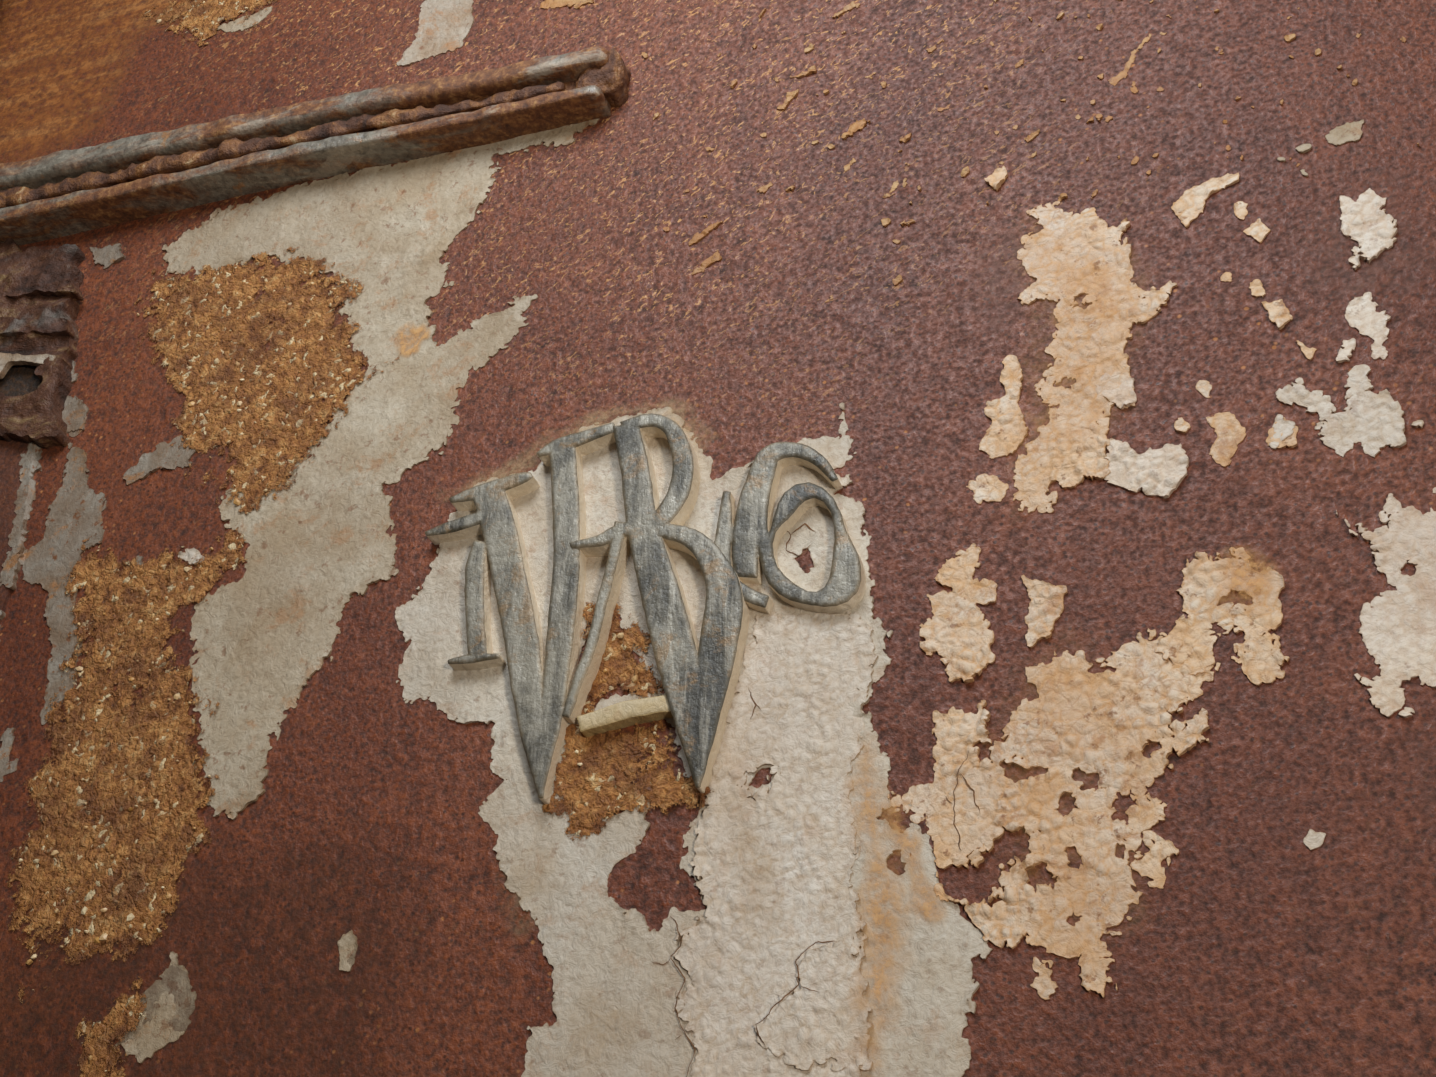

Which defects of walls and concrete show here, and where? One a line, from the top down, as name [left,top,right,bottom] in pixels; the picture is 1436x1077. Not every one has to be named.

rust [0,0,290,154]
rust [0,81,565,209]
peeling [1171,142,1243,228]
peeling [1339,188,1398,270]
peeling [162,119,599,820]
peeling [966,189,1191,513]
peeling [1266,292,1424,458]
rust [6,246,428,1003]
rust [542,601,711,841]
peeling [395,403,1290,1077]
peeling [1336,487,1436,718]
rust [70,976,157,1077]